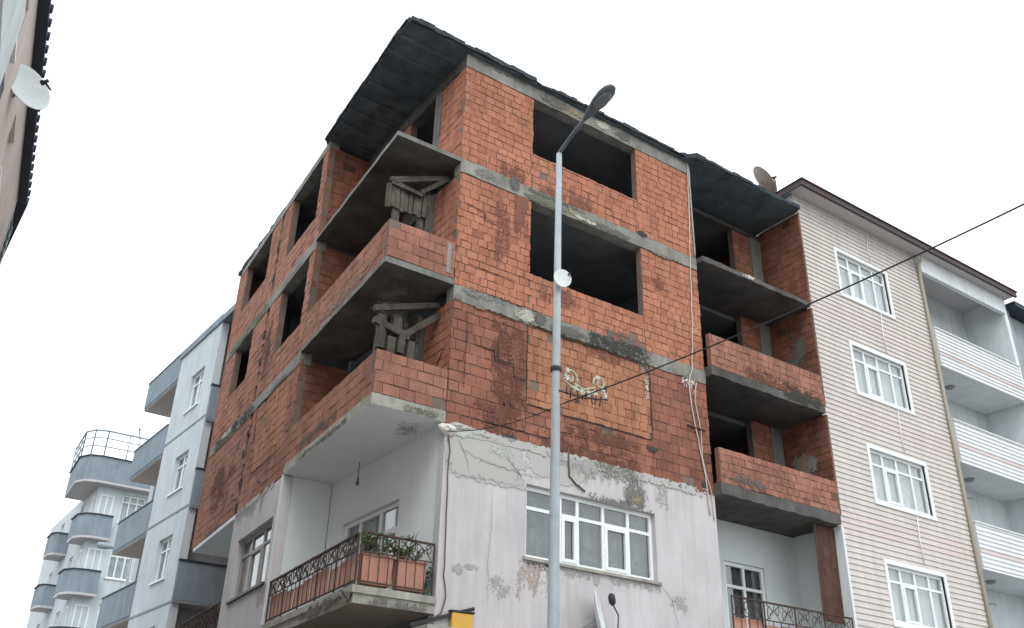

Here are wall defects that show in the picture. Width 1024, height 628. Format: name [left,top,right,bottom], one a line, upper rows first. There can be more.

water stain [476,156,639,266]
water stain [462,285,669,513]
water stain [745,366,824,410]
crack [455,439,542,593]
peeling [444,422,711,497]
peeling [791,448,817,475]